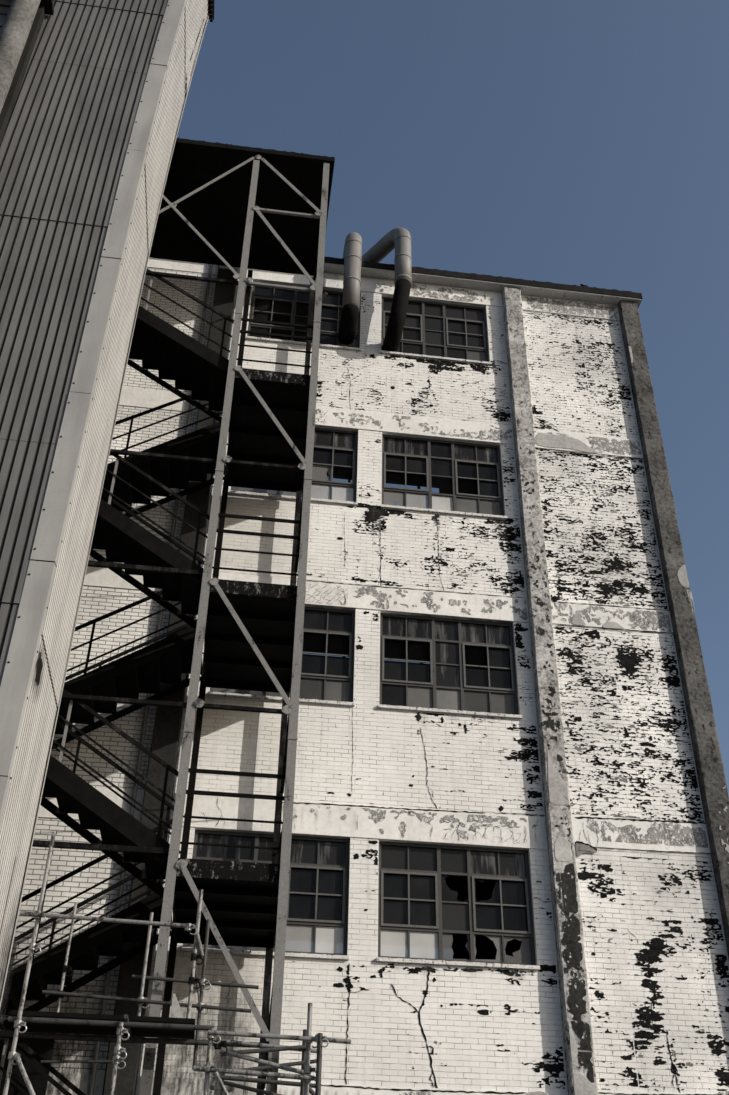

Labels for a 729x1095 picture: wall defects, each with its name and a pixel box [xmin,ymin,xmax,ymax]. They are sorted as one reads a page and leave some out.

peeling [310,284,729,1094]
crack [282,708,711,854]
crack [321,965,525,1094]